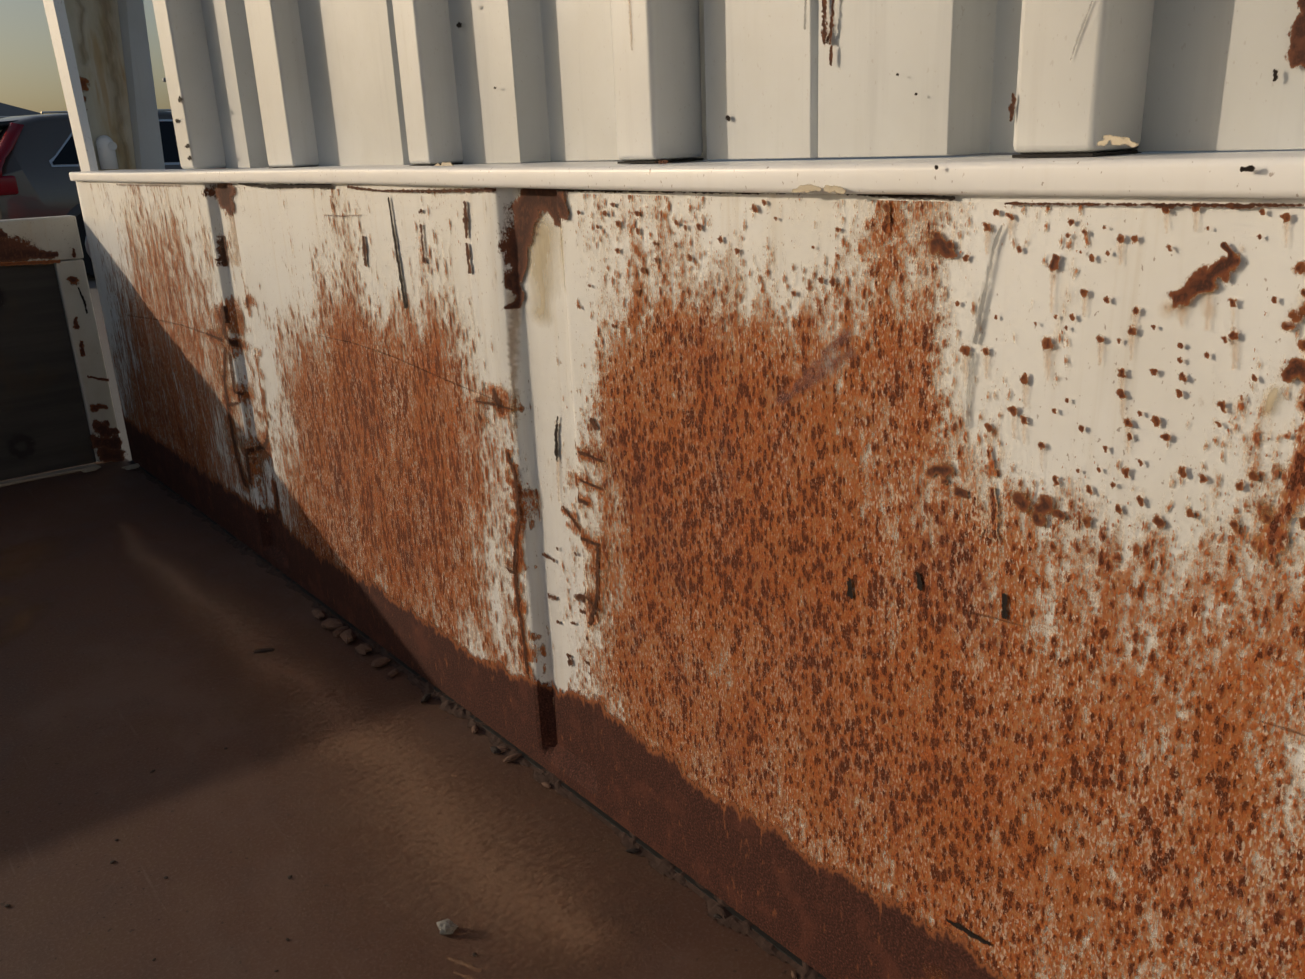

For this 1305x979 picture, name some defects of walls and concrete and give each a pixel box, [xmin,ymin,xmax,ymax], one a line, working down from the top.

corrosion [1273,0,1305,82]
corrosion [0,228,76,266]
corrosion [73,317,85,357]
corrosion [87,183,1305,979]